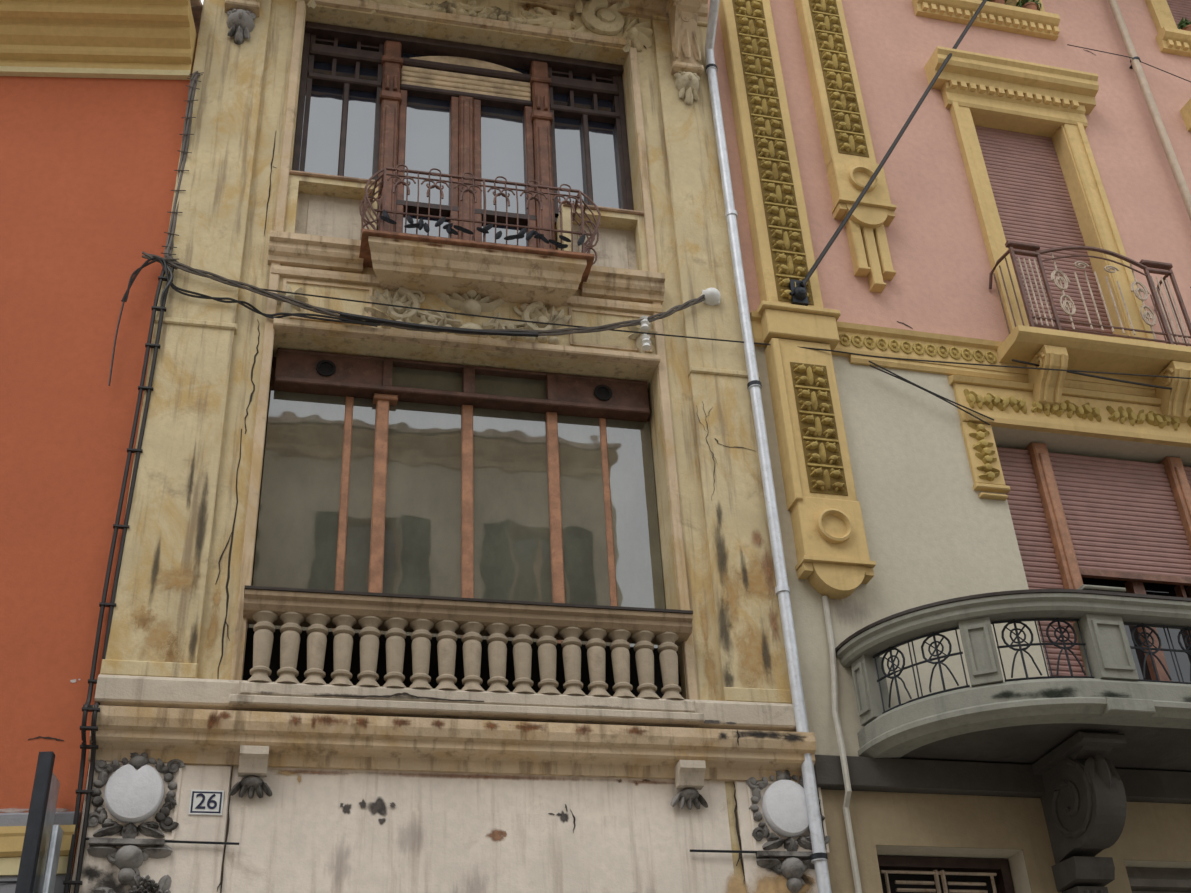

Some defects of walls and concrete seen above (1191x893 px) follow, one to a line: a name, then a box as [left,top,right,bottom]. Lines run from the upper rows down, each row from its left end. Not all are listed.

crack [696,401,754,499]
damp [151,458,207,592]
damp [134,591,220,662]
damp [701,507,770,691]
corrosion [291,716,340,728]
spalling [340,797,396,824]
peeling [487,830,507,841]
spalling [548,804,576,833]